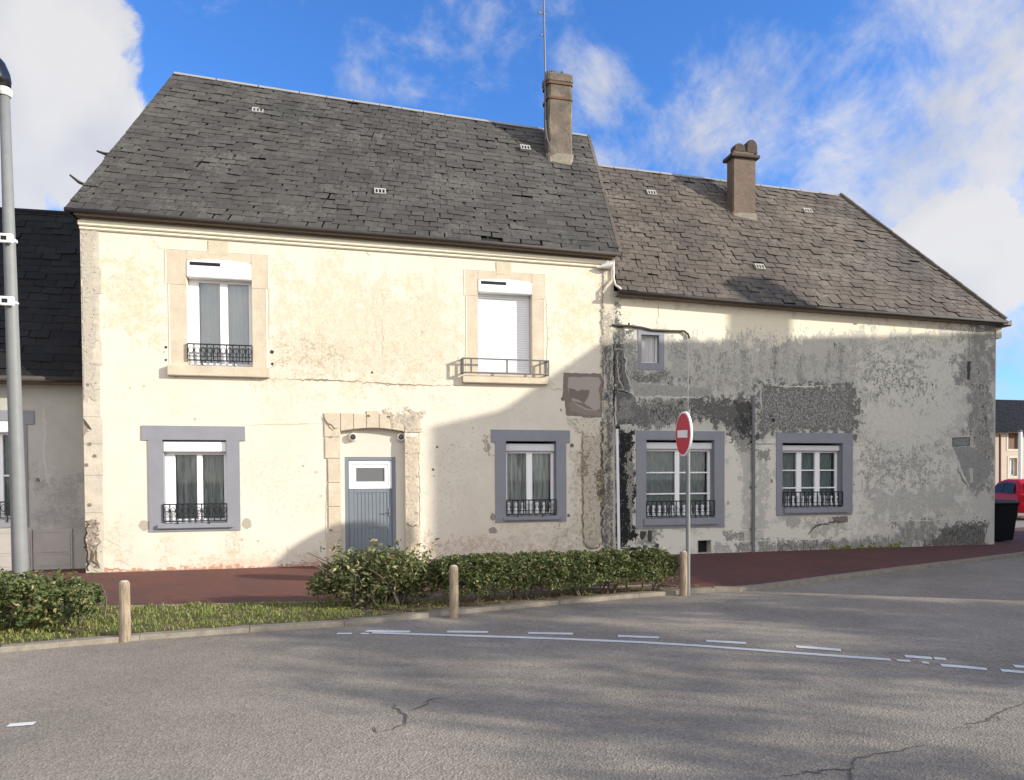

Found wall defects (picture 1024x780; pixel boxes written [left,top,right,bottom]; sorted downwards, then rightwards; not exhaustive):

peeling [640,530,659,548]